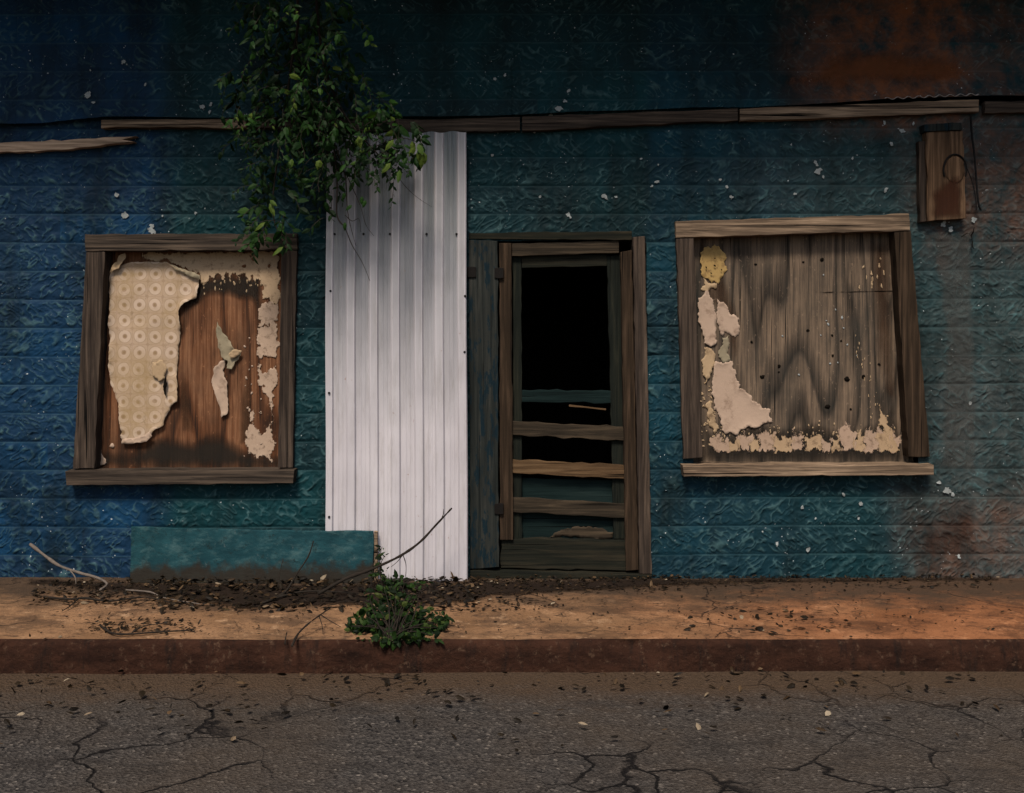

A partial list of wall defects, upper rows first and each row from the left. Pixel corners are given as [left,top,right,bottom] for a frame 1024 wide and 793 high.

peeling [142,251,281,462]
peeling [709,392,902,454]